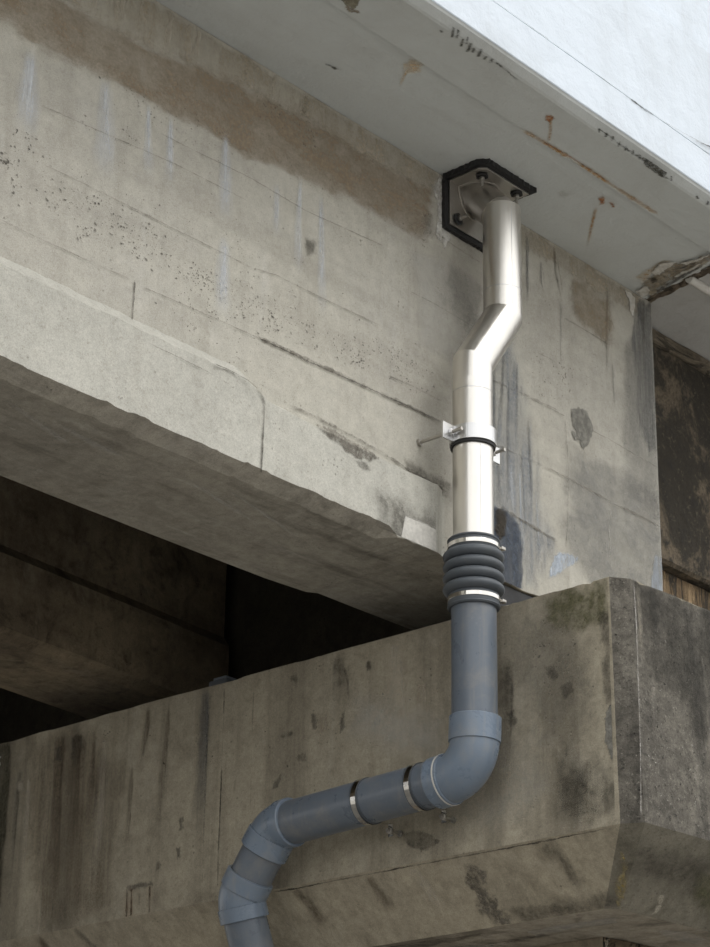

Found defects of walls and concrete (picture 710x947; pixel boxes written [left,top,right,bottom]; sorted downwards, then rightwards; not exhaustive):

water stain [0,0,450,246]
peeling [625,255,710,316]
water stain [493,352,539,589]